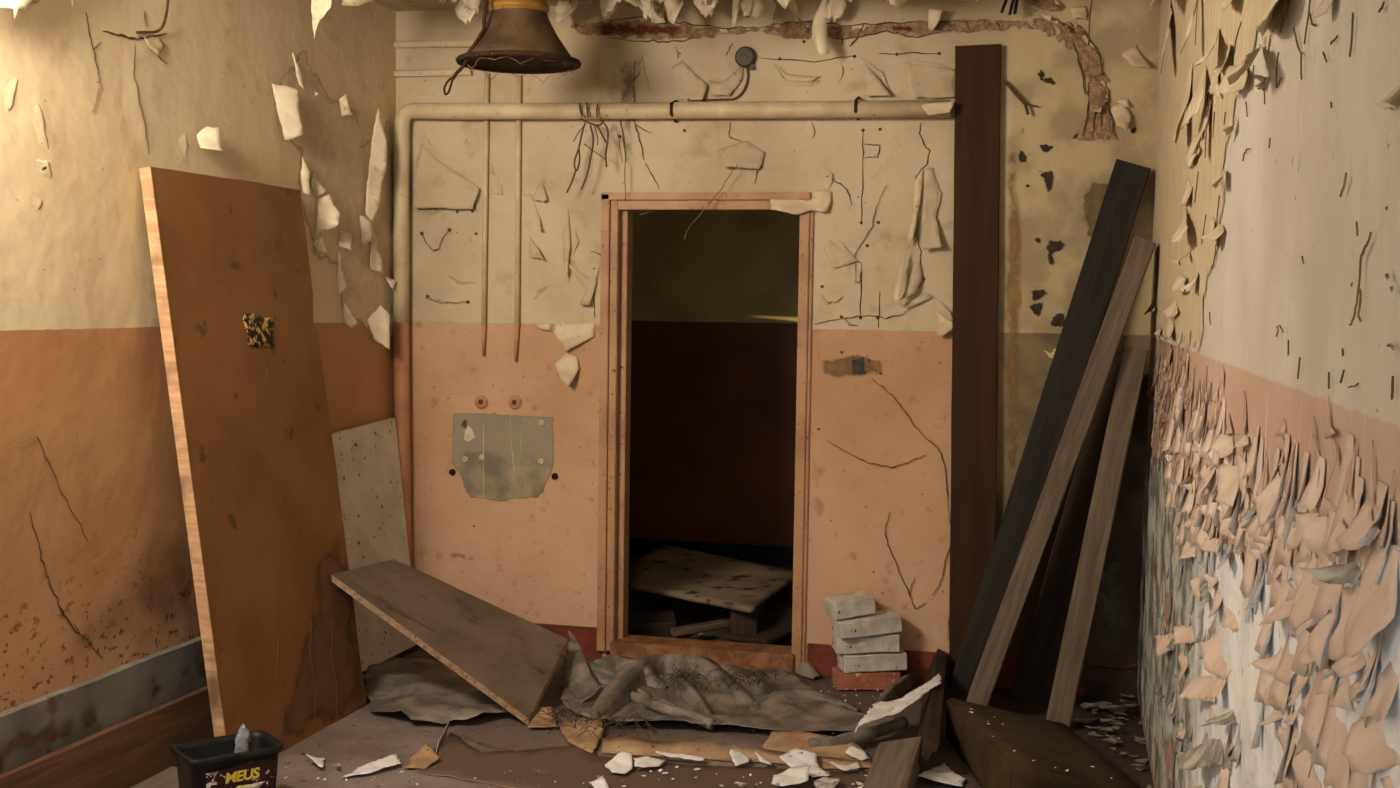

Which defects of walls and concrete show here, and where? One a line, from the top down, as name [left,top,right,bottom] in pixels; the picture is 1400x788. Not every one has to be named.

peeling [0,0,39,19]
peeling [197,127,223,151]
peeling [272,0,397,350]
peeling [413,131,503,215]
peeling [438,0,491,25]
peeling [533,211,601,386]
peeling [770,136,880,222]
flaking render [547,0,1131,141]
peeling [878,125,953,336]
peeling [1076,0,1400,788]
crack [20,436,88,541]
crack [29,511,103,659]